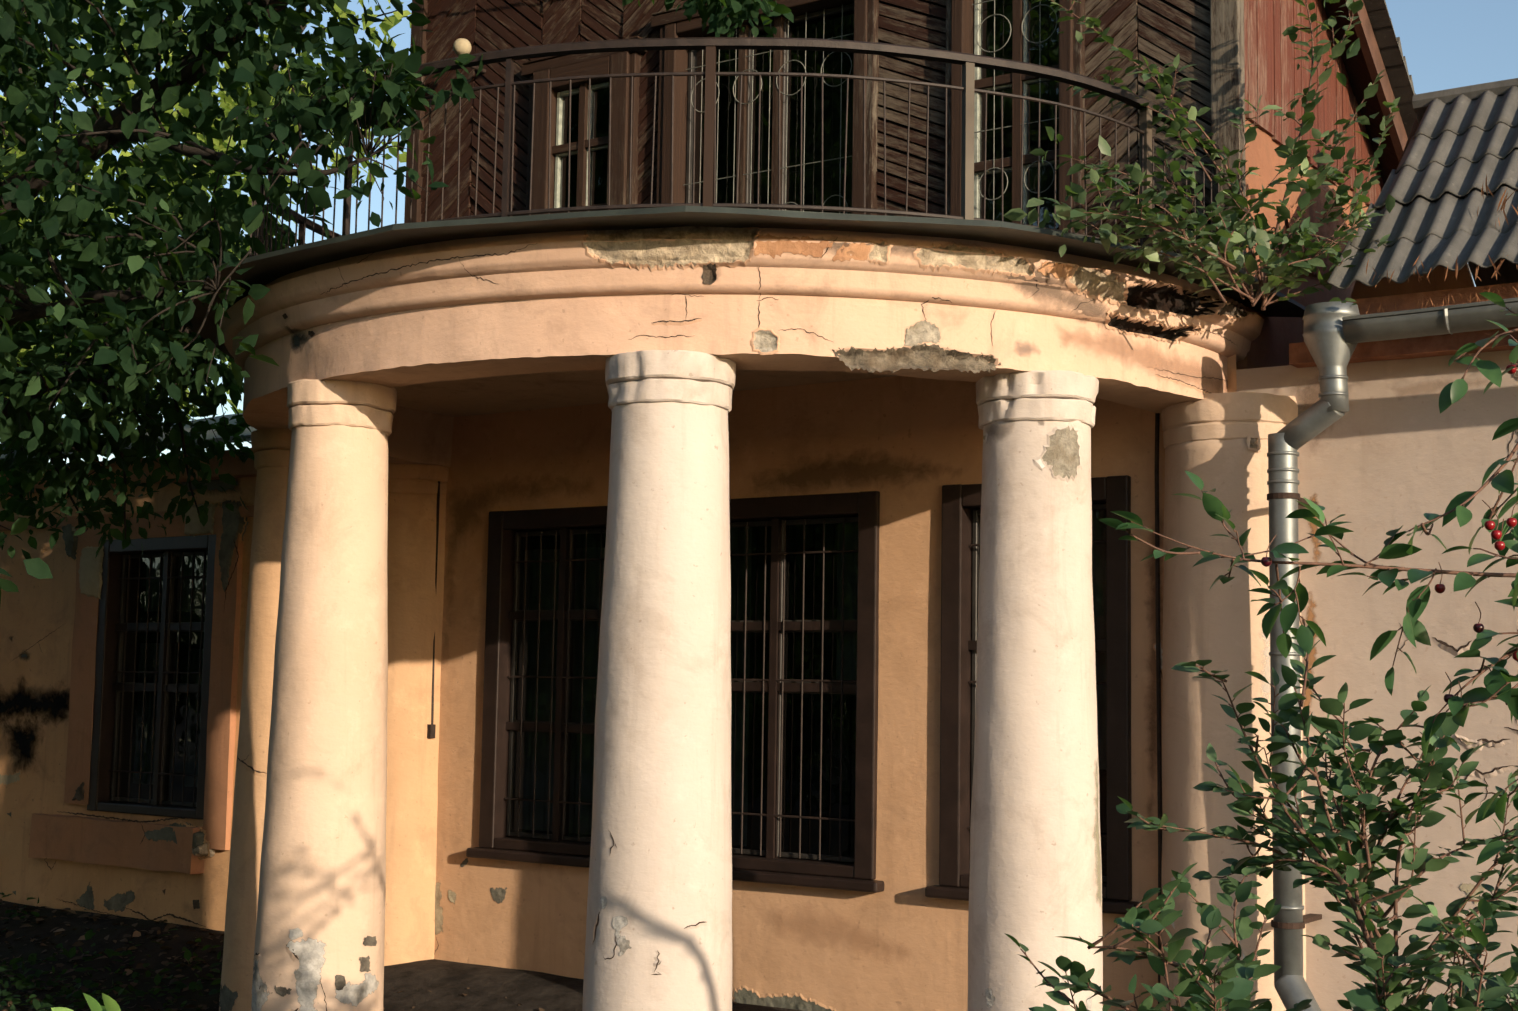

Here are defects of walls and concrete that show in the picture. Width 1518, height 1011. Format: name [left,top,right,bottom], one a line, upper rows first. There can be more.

crack [630,294,704,340]
spalling [581,226,1001,373]
spalling [913,241,1257,344]
peeling [1032,423,1081,483]
spalling [76,882,135,912]
peeling [591,896,631,960]
peeling [219,928,379,1011]